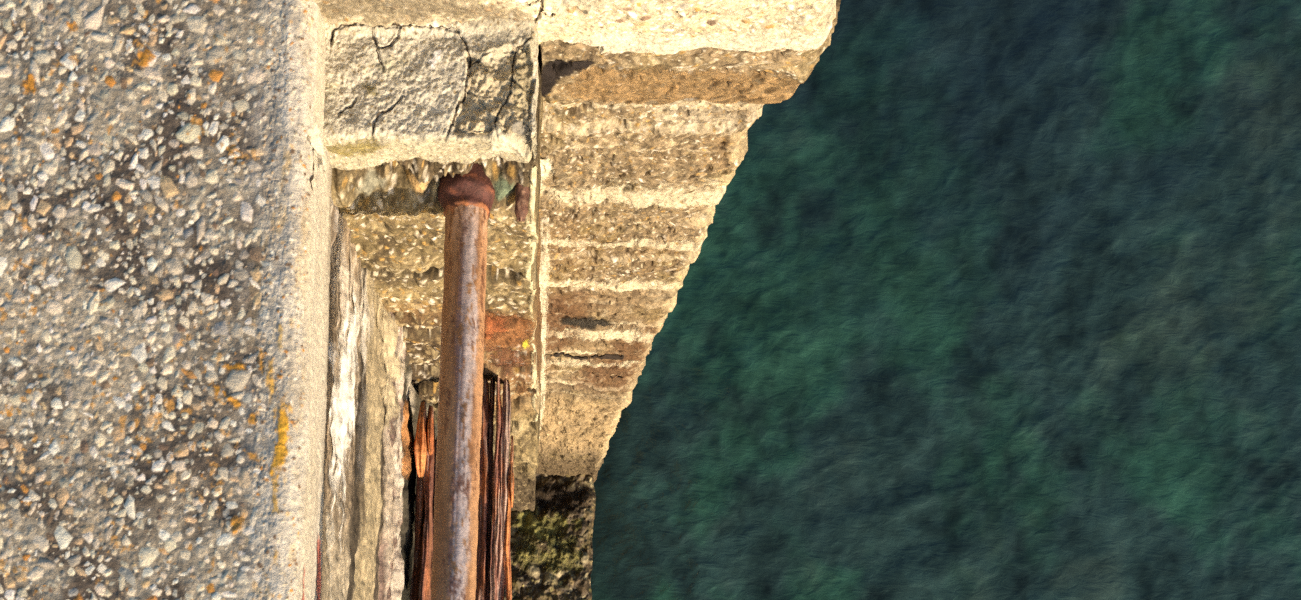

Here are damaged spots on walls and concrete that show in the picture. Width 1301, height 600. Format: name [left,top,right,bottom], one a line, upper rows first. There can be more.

crack [330,0,555,141]
crack [307,97,401,190]
rust [475,311,533,600]